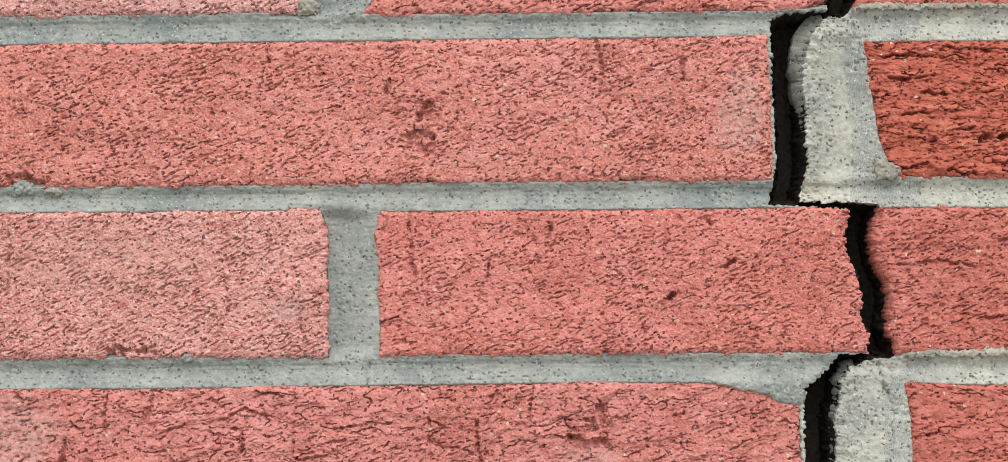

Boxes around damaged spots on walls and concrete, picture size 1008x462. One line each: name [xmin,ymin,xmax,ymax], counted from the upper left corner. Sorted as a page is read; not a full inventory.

crack [768,0,896,462]